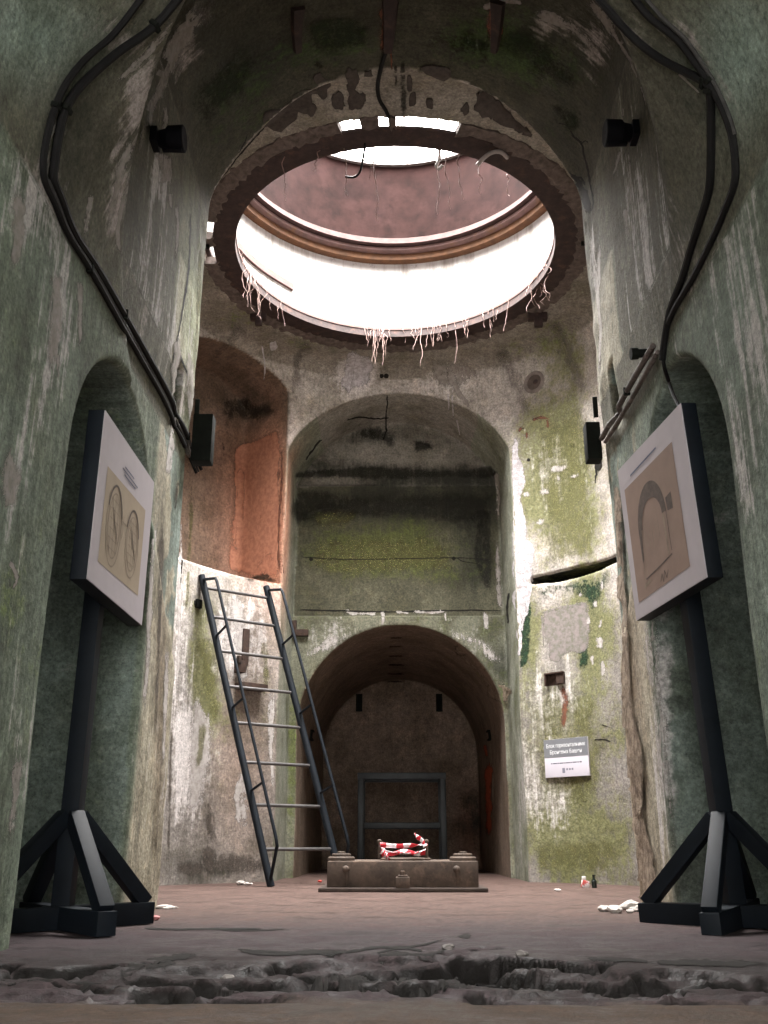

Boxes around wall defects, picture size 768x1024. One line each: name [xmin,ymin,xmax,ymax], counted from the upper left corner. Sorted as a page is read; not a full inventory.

peeling [407,65,452,109]
peeling [460,91,532,137]
crack [348,395,388,439]
leakage [360,427,394,446]
leakage [292,439,534,655]
leakage [457,635,497,660]
rust [558,684,569,727]